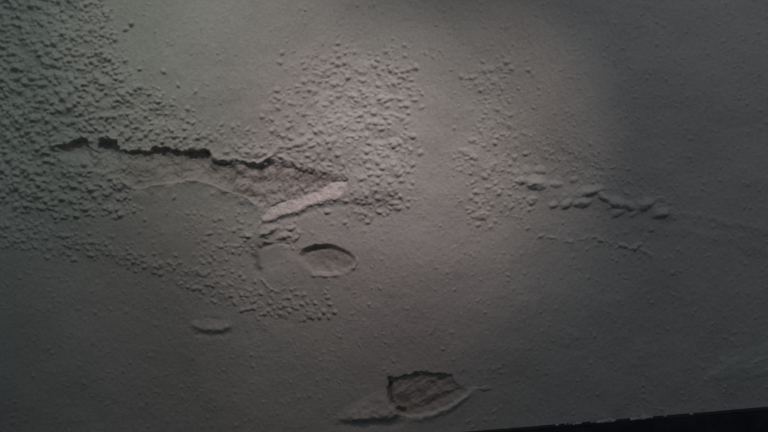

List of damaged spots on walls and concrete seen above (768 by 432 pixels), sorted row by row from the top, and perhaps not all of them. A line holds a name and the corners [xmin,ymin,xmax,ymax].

peeling [44,131,349,222]
spalling [299,243,361,278]
spalling [335,371,481,422]